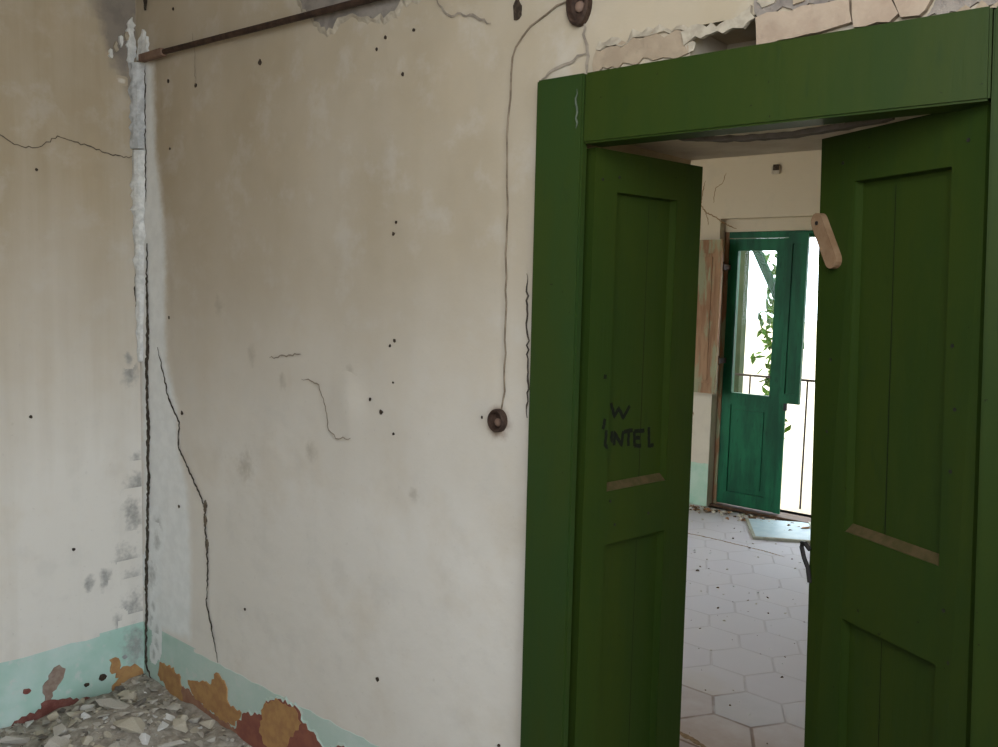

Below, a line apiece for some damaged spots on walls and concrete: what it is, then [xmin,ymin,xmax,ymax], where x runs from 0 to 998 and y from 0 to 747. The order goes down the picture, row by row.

flaking render [297,0,422,37]
flaking render [592,0,998,72]
crack [0,70,147,197]
crack [134,243,218,678]
peeling [11,655,144,726]
peeling [158,662,346,747]